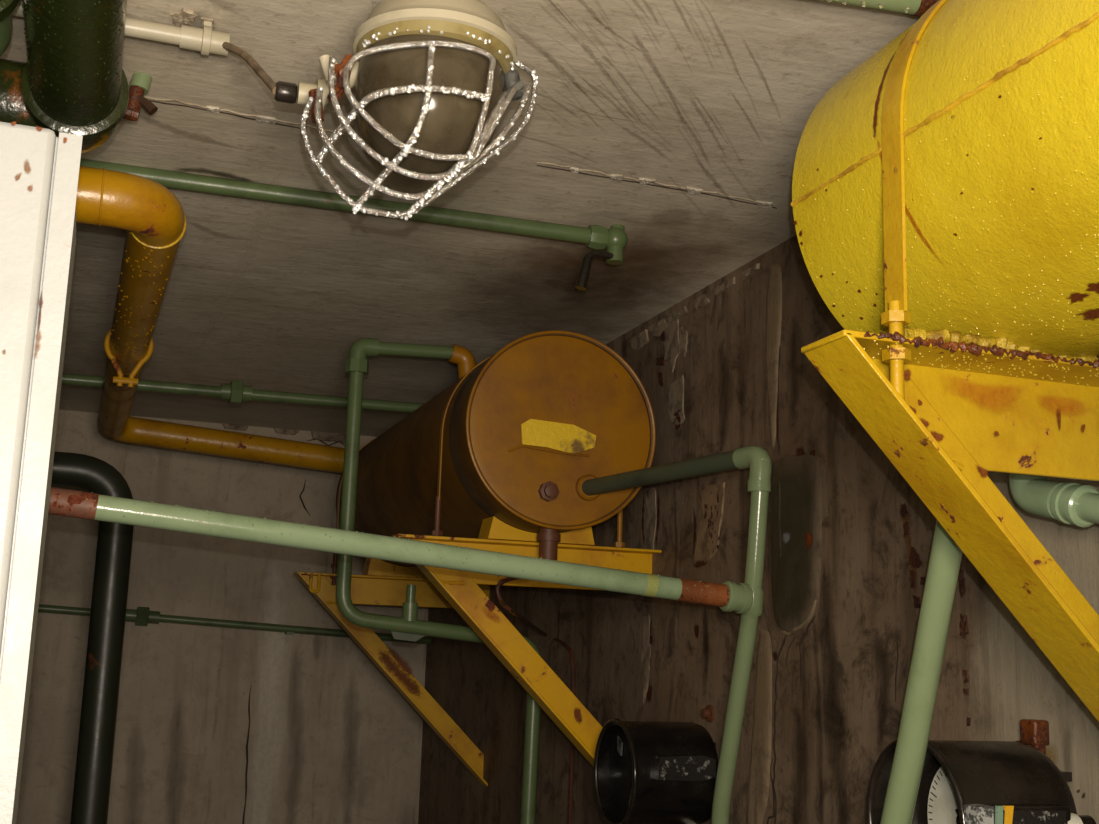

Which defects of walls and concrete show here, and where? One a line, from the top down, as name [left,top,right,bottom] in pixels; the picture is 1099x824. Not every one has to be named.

peeling [629,263,760,429]
peeling [642,487,660,550]
peeling [693,482,725,567]
crack [242,685,252,824]